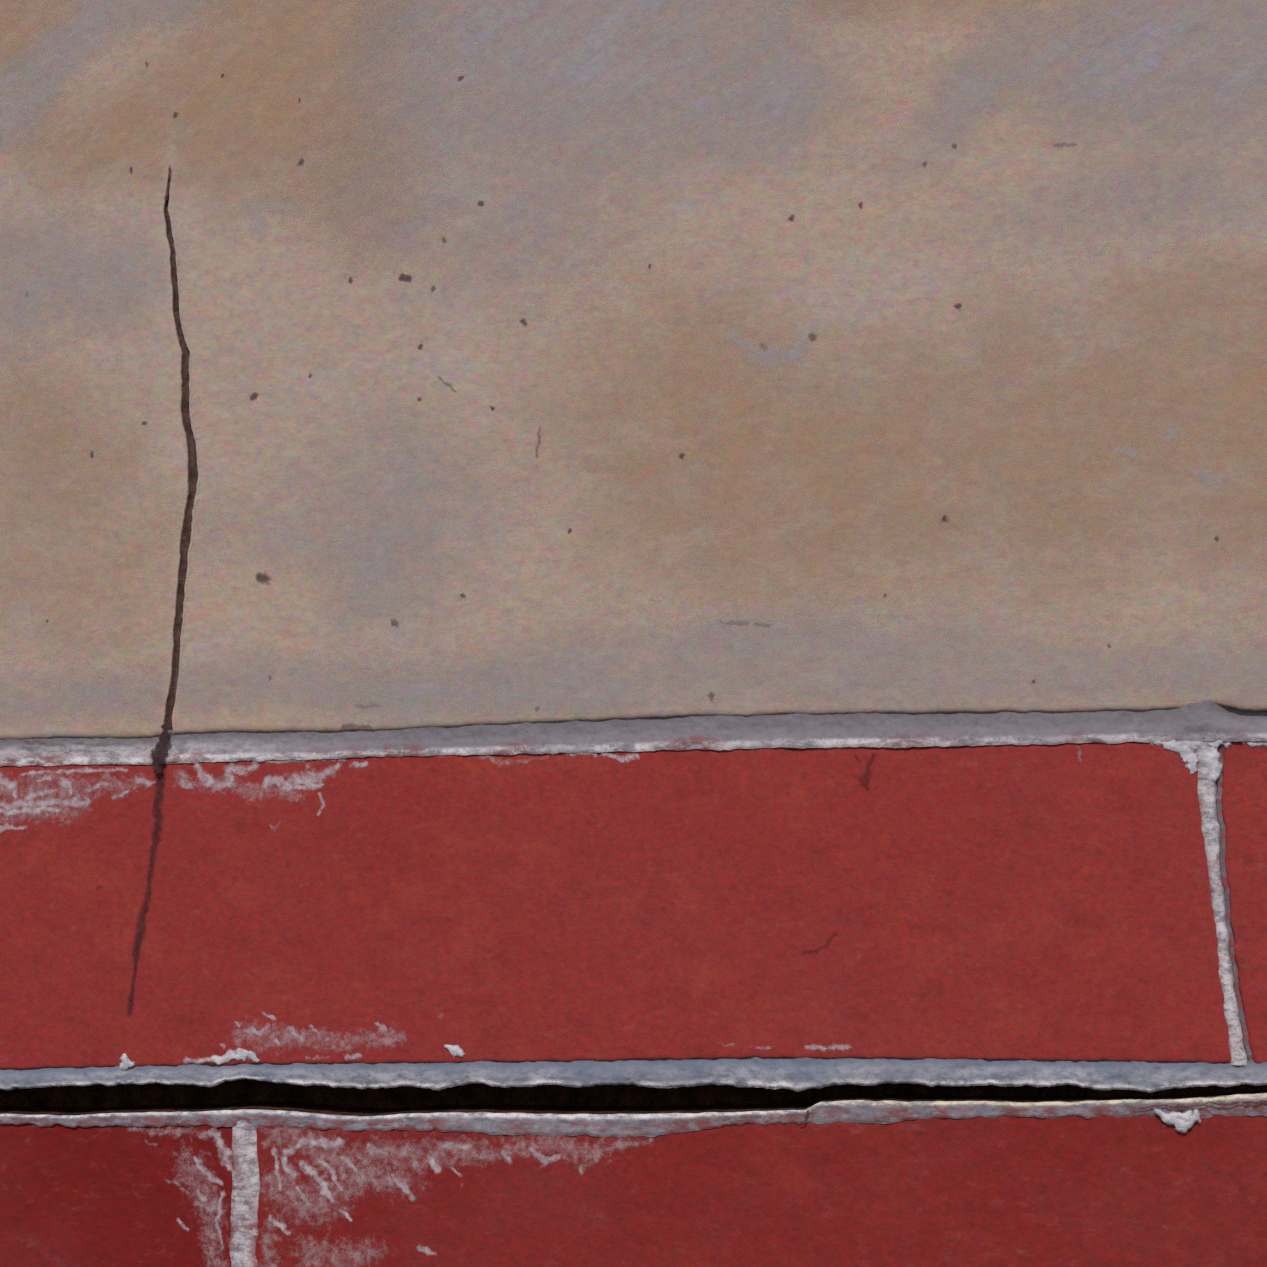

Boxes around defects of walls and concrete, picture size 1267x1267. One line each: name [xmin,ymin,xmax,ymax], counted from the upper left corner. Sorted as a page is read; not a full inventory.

crack [128,165,198,1015]
crack [0,1079,1267,1123]
efflorescence [183,1131,233,1253]
efflorescence [272,1131,414,1221]
efflorescence [367,1143,472,1175]
efflorescence [502,1146,571,1164]